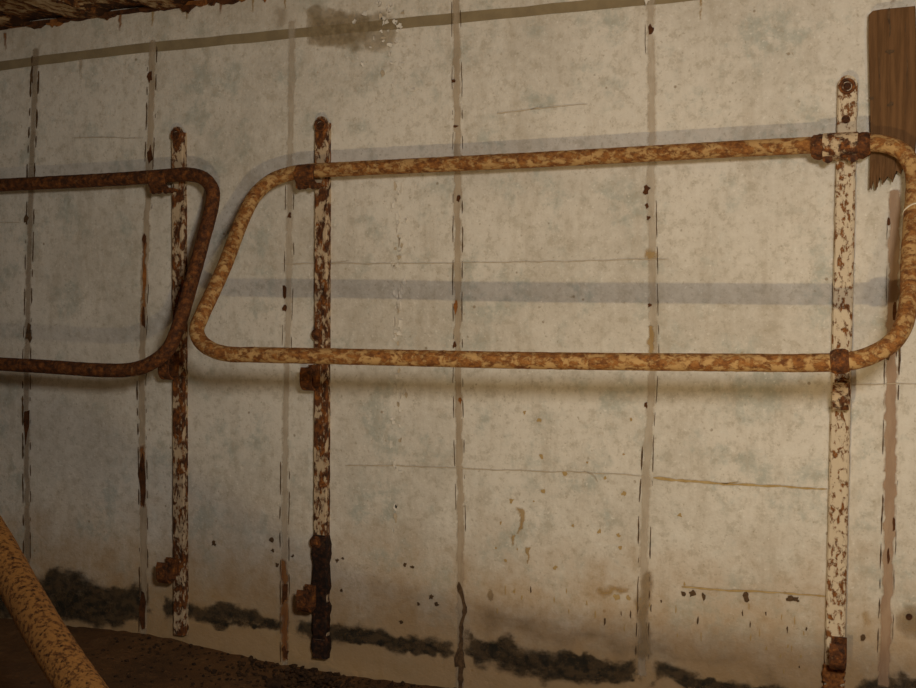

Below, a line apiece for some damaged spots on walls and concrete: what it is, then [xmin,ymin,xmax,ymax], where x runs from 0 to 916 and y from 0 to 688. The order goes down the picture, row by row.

rust [0,0,266,45]
leakage [352,2,405,77]
leakage [509,499,530,563]
mould [40,568,147,627]
leakage [188,602,282,631]
leakage [298,621,313,639]
leakage [900,611,916,634]
leakage [329,624,635,684]
mould [657,663,779,688]
leakage [858,672,916,688]